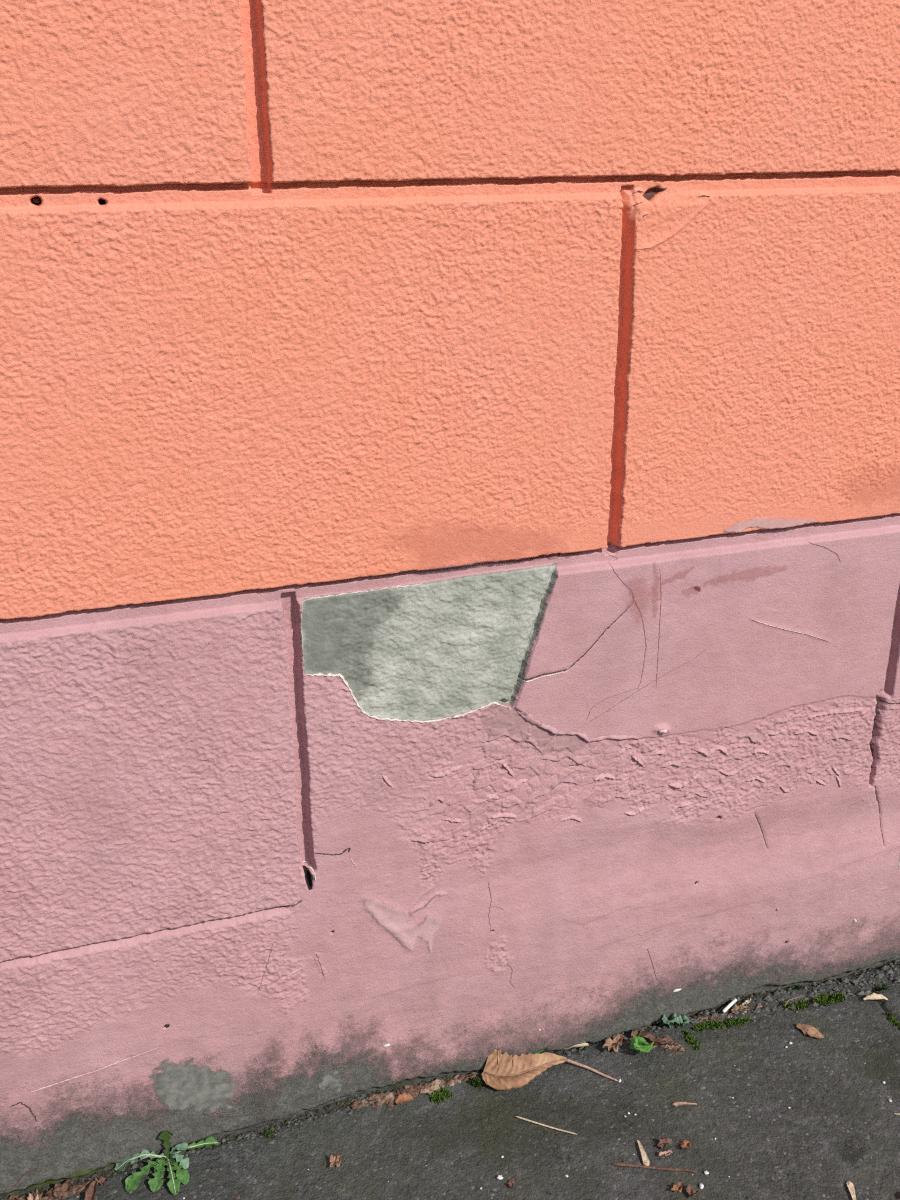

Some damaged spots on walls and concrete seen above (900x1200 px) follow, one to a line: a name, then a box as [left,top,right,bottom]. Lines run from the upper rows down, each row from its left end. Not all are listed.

spalling [627,187,667,221]
spalling [301,564,714,831]
crack [519,548,713,725]
peeling [690,707,864,783]
crack [869,695,900,843]
leakage [202,928,900,1128]